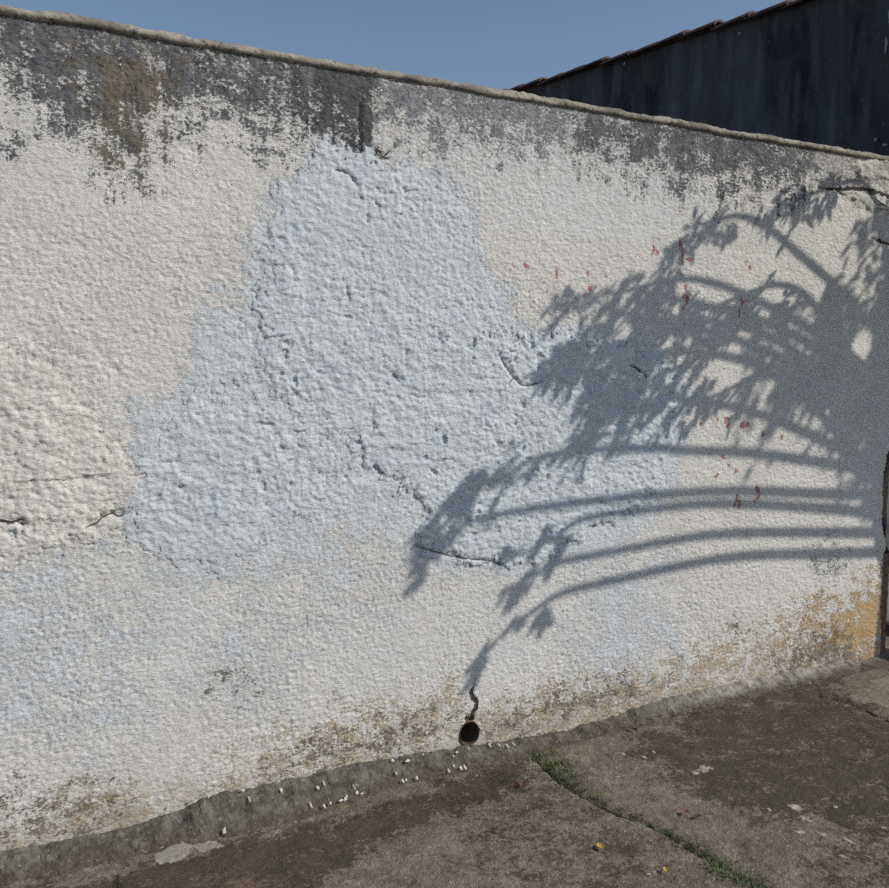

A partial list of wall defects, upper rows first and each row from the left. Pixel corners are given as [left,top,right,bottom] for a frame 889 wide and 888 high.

water stain [0,15,832,227]
crack [501,358,541,386]
crack [414,546,509,564]
crack [465,686,478,720]
water stain [200,586,837,797]
crack [532,759,752,885]